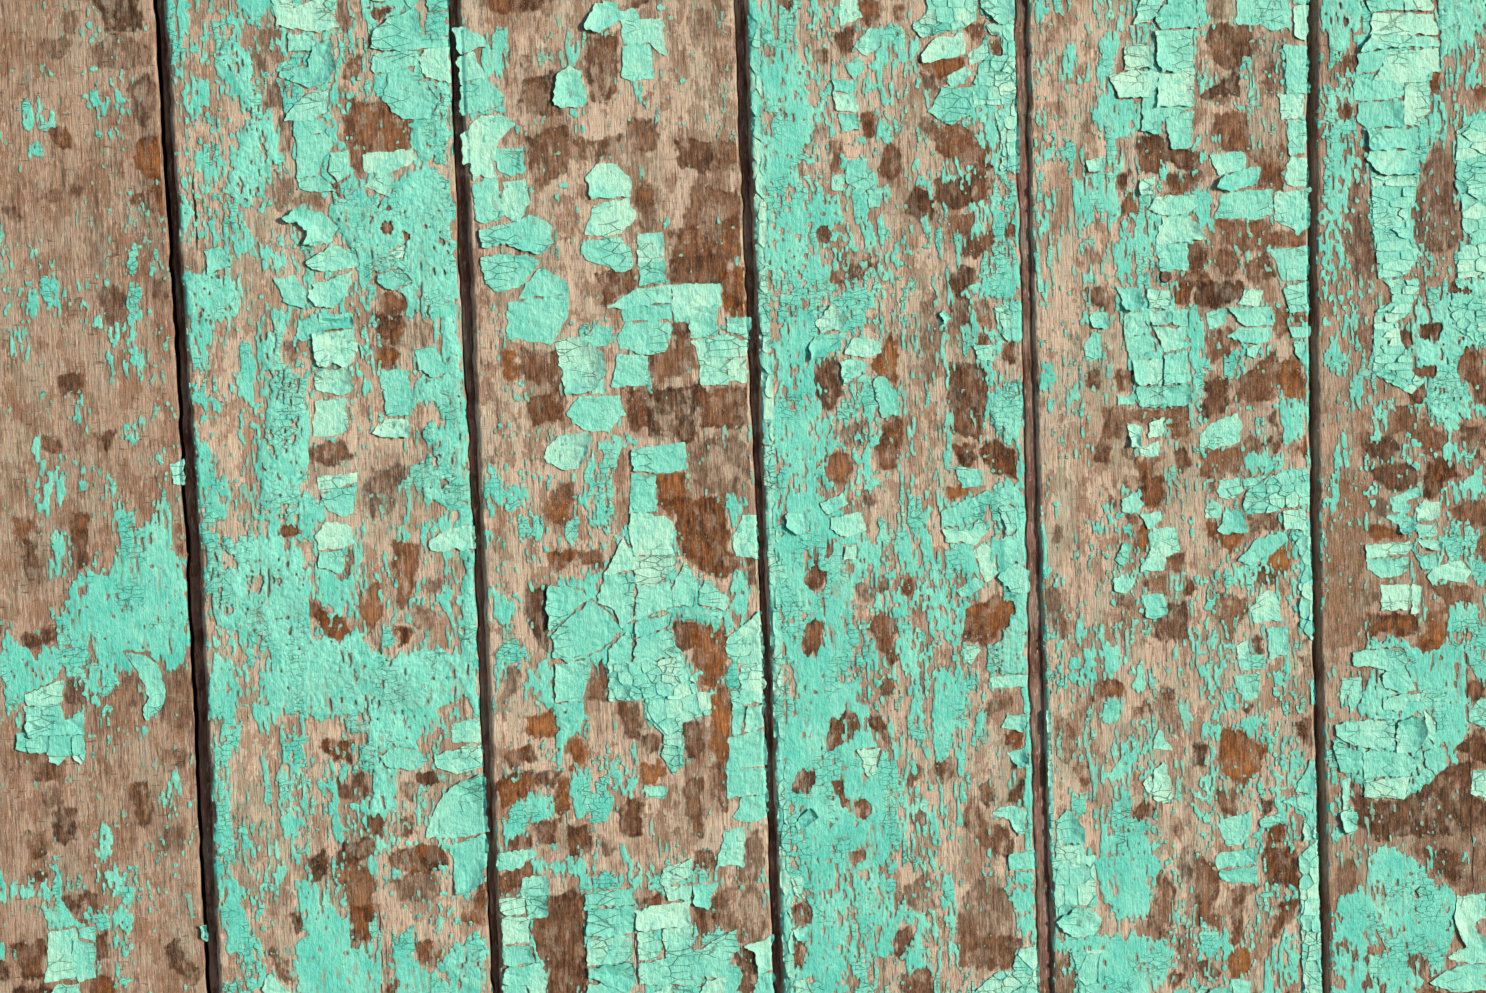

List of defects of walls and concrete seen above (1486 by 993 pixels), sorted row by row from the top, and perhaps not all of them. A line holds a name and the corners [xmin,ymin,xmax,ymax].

peeling [0,0,1040,993]
peeling [1027,0,1486,993]